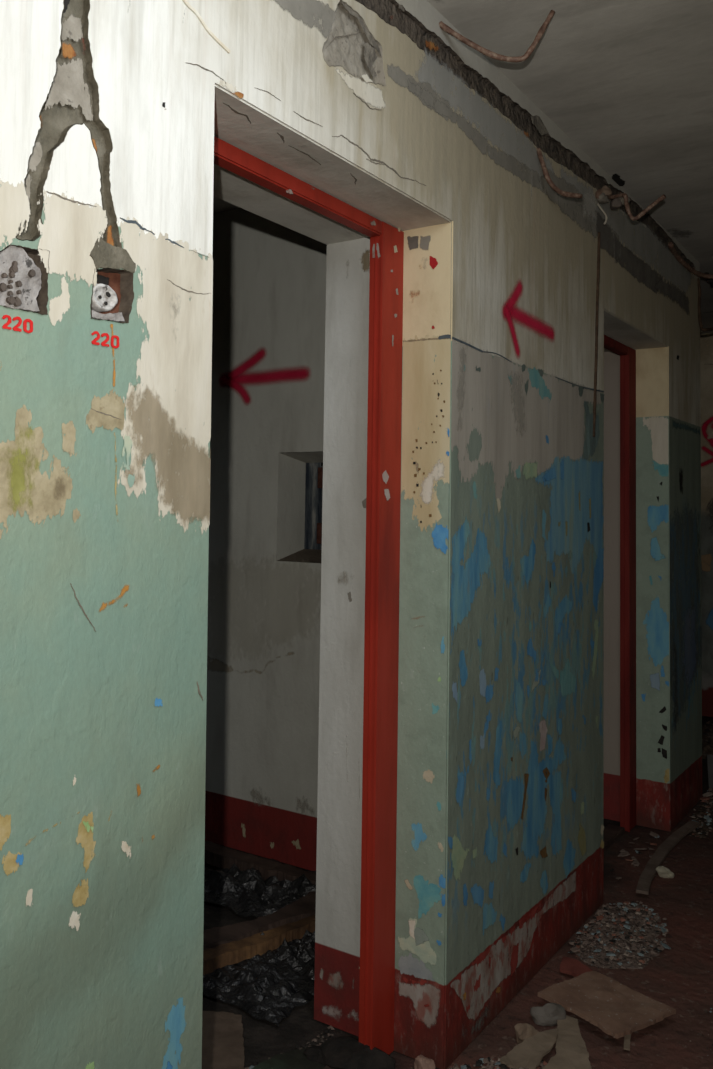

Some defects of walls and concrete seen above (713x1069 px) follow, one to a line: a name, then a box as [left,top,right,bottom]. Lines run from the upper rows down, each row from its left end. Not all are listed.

crack [186,62,251,124]
crack [257,88,426,186]
flaking render [322,0,386,110]
peeling [0,178,213,539]
peeling [382,335,604,679]
peeling [641,415,713,783]
spalling [0,814,25,876]
spalling [69,812,96,931]
peeling [398,621,586,1033]
peeling [161,997,187,1069]
spalling [322,1007,357,1019]
spalling [320,967,360,990]